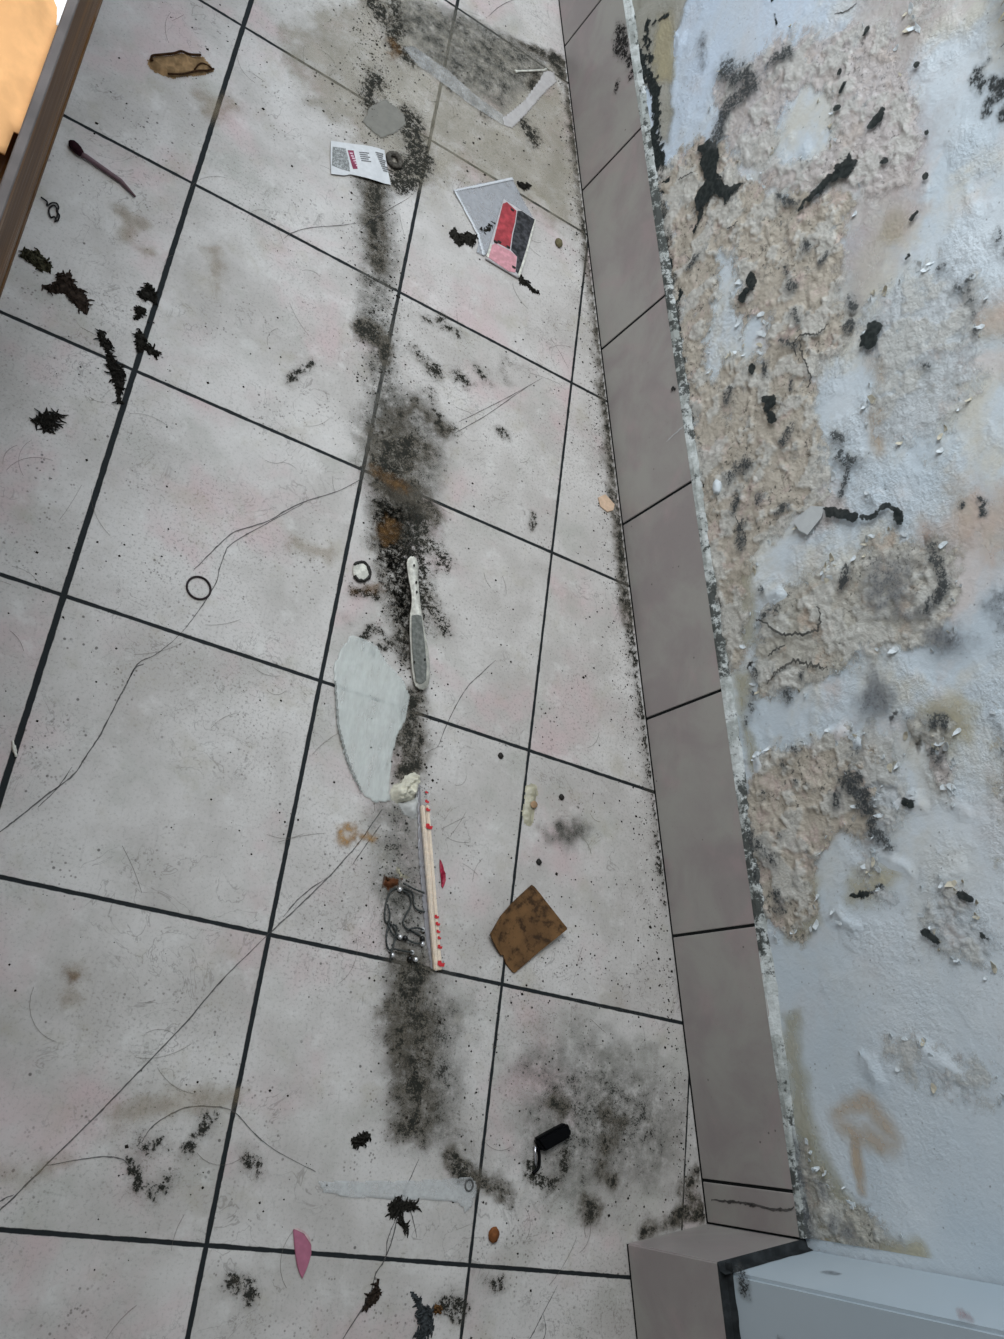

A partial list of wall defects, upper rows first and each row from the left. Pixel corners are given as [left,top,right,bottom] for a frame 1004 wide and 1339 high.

damp [613,0,700,340]
damp [692,45,793,234]
damp [775,153,858,212]
peeling [658,0,989,699]
damp [842,294,883,350]
damp [349,0,666,908]
damp [823,429,904,525]
peeling [747,711,961,944]
damp [375,806,460,1157]
peeling [884,1033,1004,1109]
peeling [917,880,998,980]
crack [711,1199,794,1212]